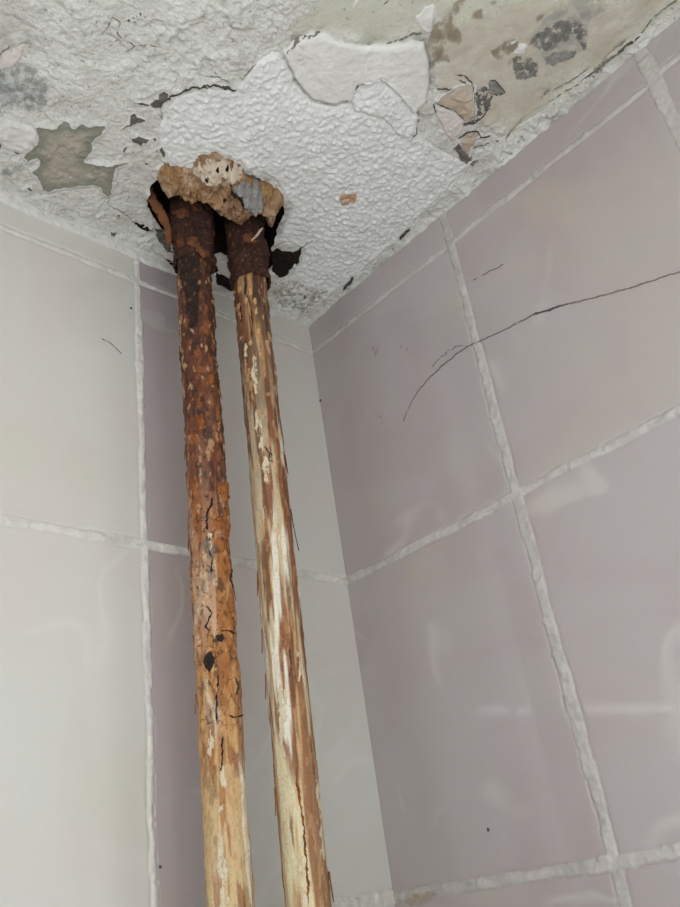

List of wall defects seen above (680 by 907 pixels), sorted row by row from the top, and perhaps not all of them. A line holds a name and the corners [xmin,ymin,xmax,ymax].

leakage [426,0,665,126]
peeling [346,79,420,141]
peeling [14,90,173,265]
rust [176,236,210,259]
rust [172,203,215,237]
spalling [212,198,232,291]
flaking render [264,206,312,278]
crack [403,271,680,421]
rust [218,481,230,503]